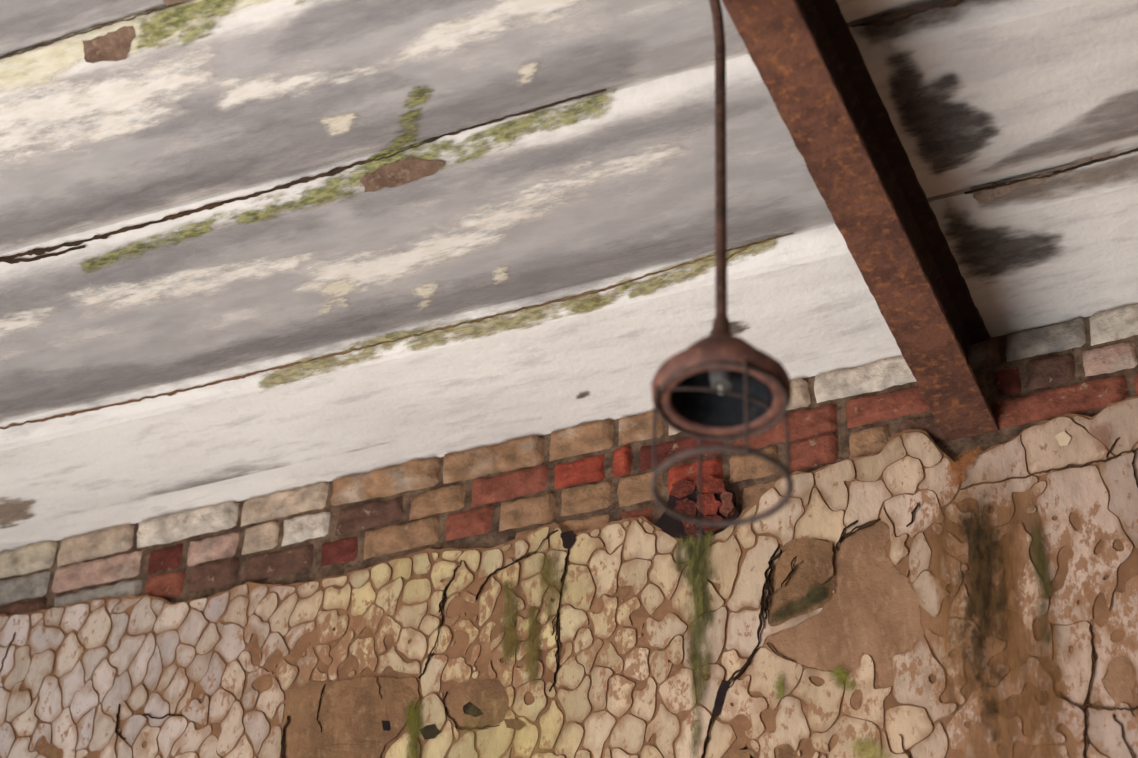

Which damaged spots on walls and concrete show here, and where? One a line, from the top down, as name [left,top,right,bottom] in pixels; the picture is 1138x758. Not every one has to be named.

spalling [82,26,135,63]
water stain [889,54,997,174]
water stain [0,0,833,413]
water stain [945,209,1058,278]
flaking render [967,304,1138,429]
water stain [164,475,245,493]
flaking render [0,356,946,616]
crack [960,437,1138,490]
crack [418,560,462,679]
crack [476,530,569,692]
crack [701,544,780,758]
peeling [280,672,422,758]